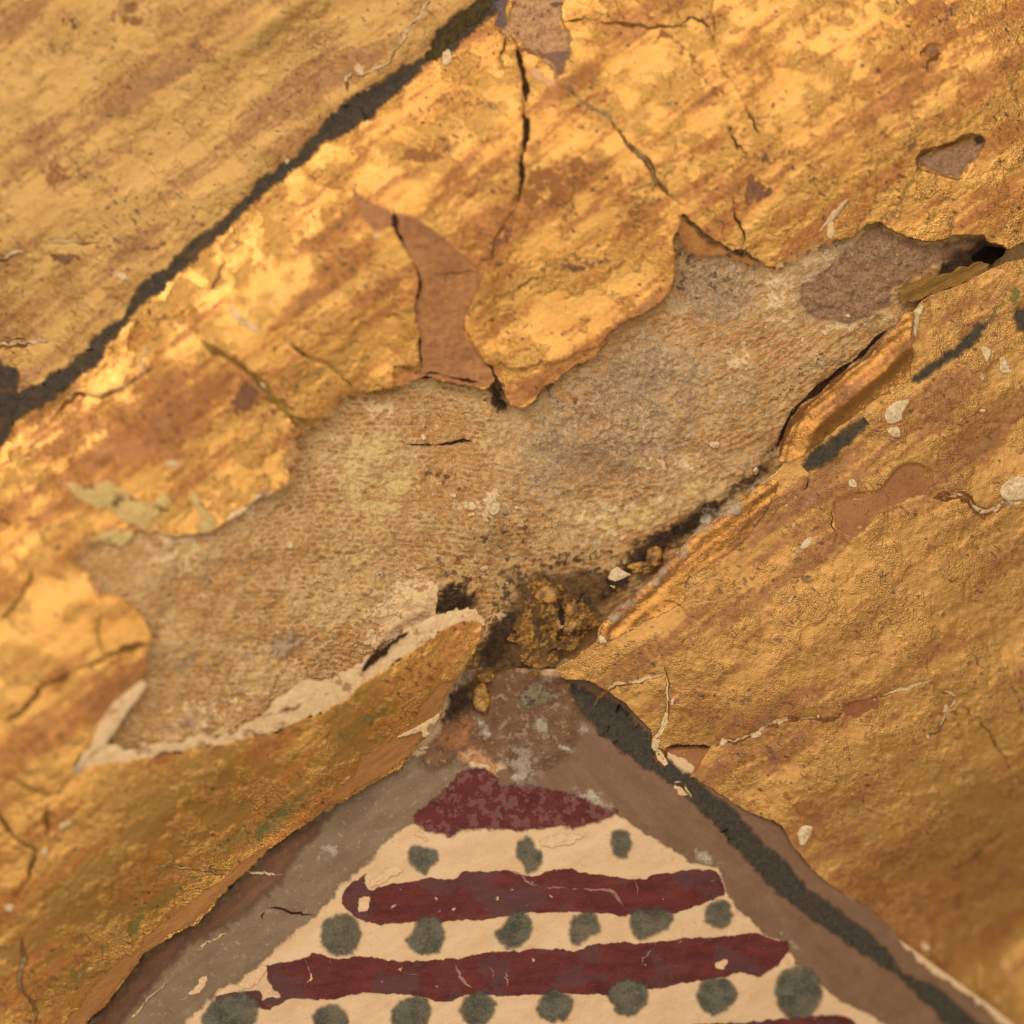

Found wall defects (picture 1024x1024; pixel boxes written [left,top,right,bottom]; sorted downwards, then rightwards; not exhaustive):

crack [487,36,530,270]
crack [563,80,681,205]
spalling [908,131,984,181]
crack [0,337,48,349]
crack [54,224,262,416]
crack [201,340,324,430]
crack [403,438,471,446]
peeling [65,188,1024,777]
damp [724,501,741,516]
crack [933,491,1022,520]
crack [592,667,670,767]
crack [715,712,842,747]